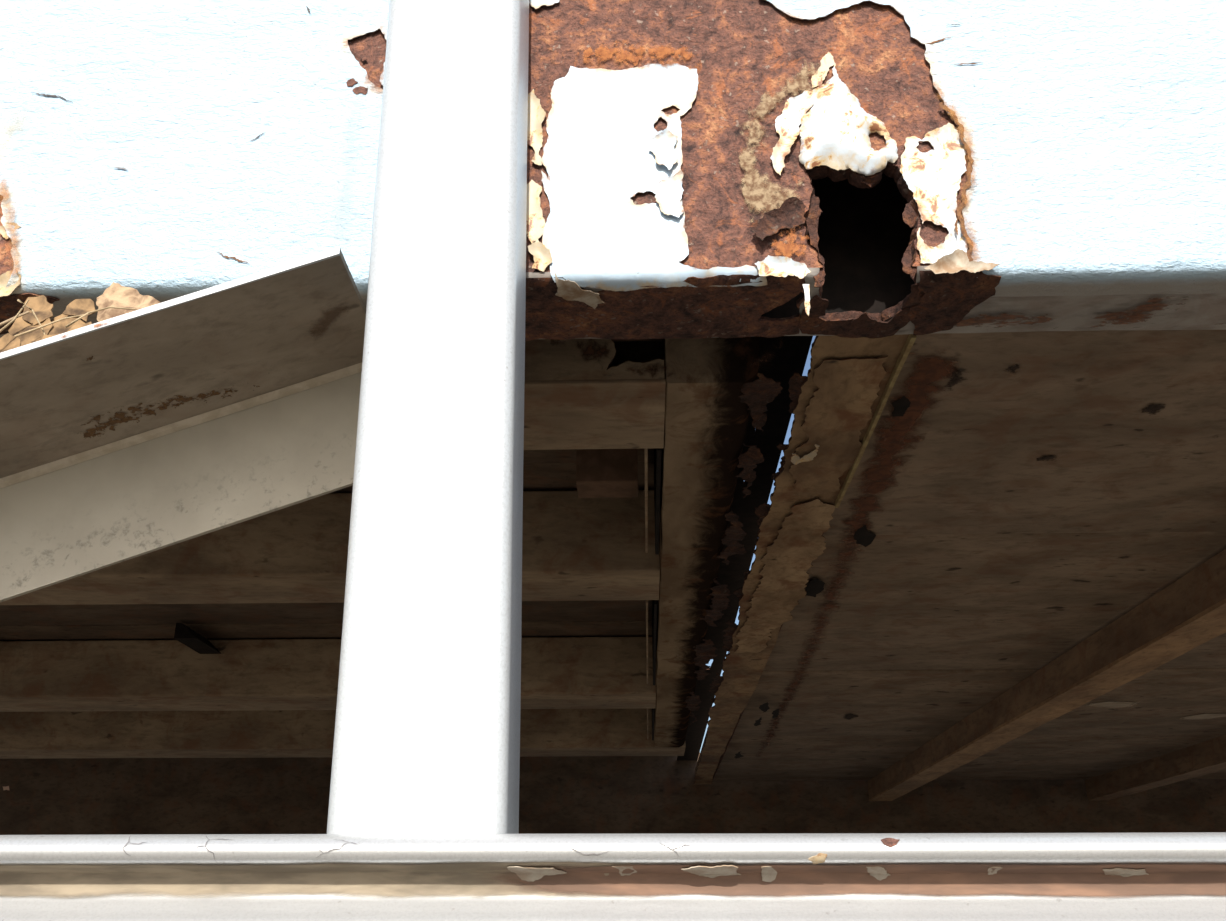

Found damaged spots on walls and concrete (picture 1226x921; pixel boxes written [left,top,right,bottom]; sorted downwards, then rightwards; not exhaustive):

peeling [529,0,560,9]
rust [0,181,60,335]
peeling [526,63,811,316]
peeling [739,49,825,240]
rust [525,0,1053,366]
peeling [900,123,1000,275]
rust [83,388,238,440]
rust [754,357,967,756]
peeling [808,853,827,864]